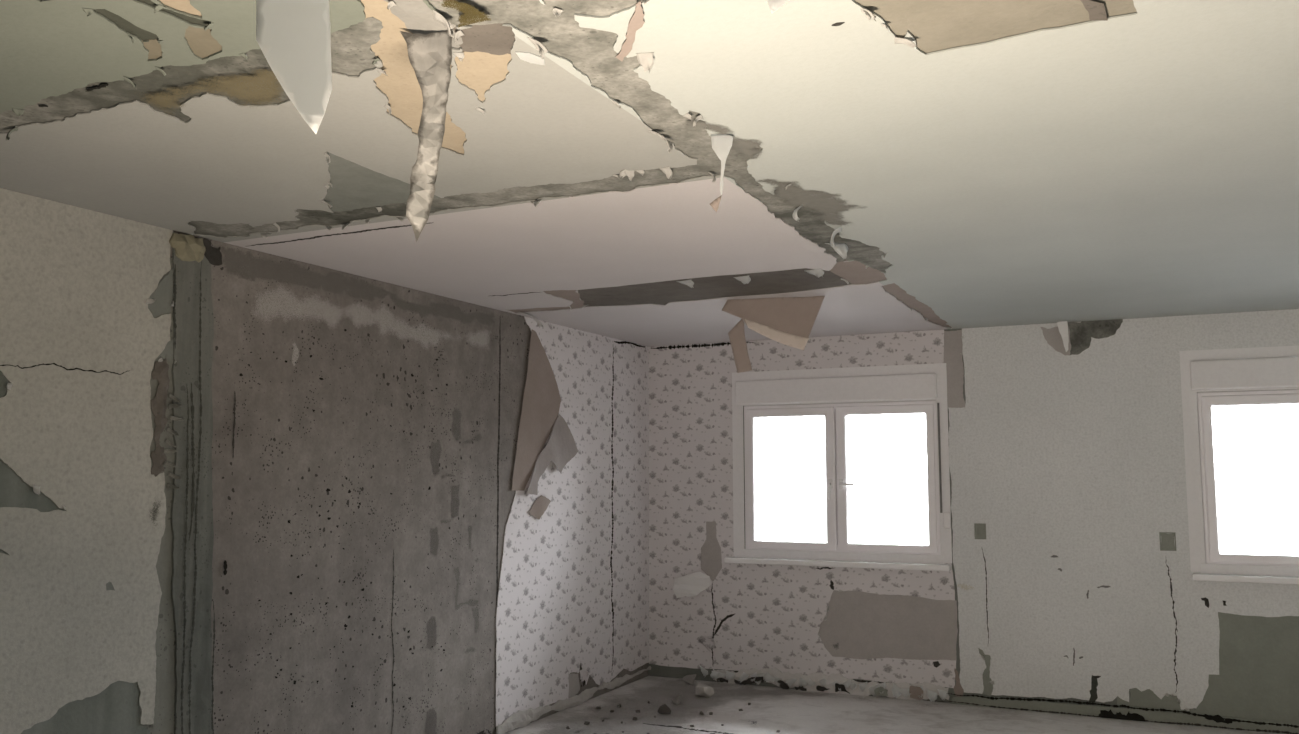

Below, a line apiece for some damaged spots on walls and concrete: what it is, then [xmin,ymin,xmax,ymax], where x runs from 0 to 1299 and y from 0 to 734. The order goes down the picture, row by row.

spalling [82,8,166,76]
spalling [139,0,222,58]
peeling [361,0,548,134]
peeling [855,0,1137,53]
crack [0,363,130,375]
peeling [1041,319,1123,355]
peeling [0,459,67,512]
peeling [21,258,184,734]
peeling [818,589,958,668]
crack [981,549,989,643]
crack [921,564,1299,734]
peeling [1099,597,1299,723]